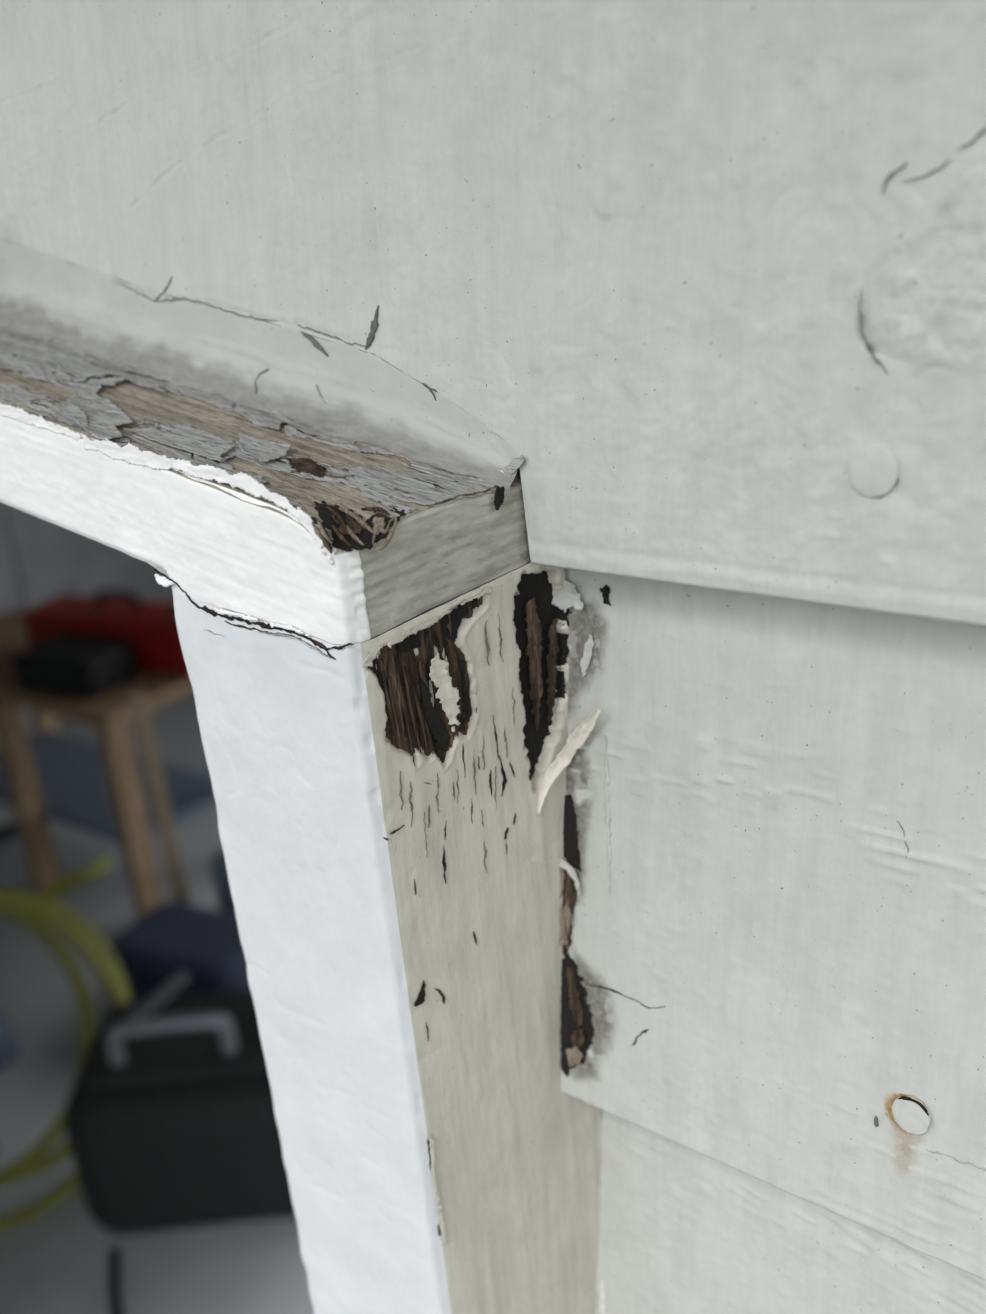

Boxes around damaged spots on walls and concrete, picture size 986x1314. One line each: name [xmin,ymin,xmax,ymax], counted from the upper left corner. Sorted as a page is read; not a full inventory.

crack [111,276,366,347]
spalling [365,305,379,350]
crack [422,383,437,401]
peeling [0,325,525,565]
crack [153,569,354,660]
peeling [600,585,611,606]
peeling [429,653,461,732]
peeling [462,716,515,796]
peeling [536,709,601,815]
peeling [560,858,580,896]
peeling [414,980,445,1007]
rust [887,1093,921,1127]